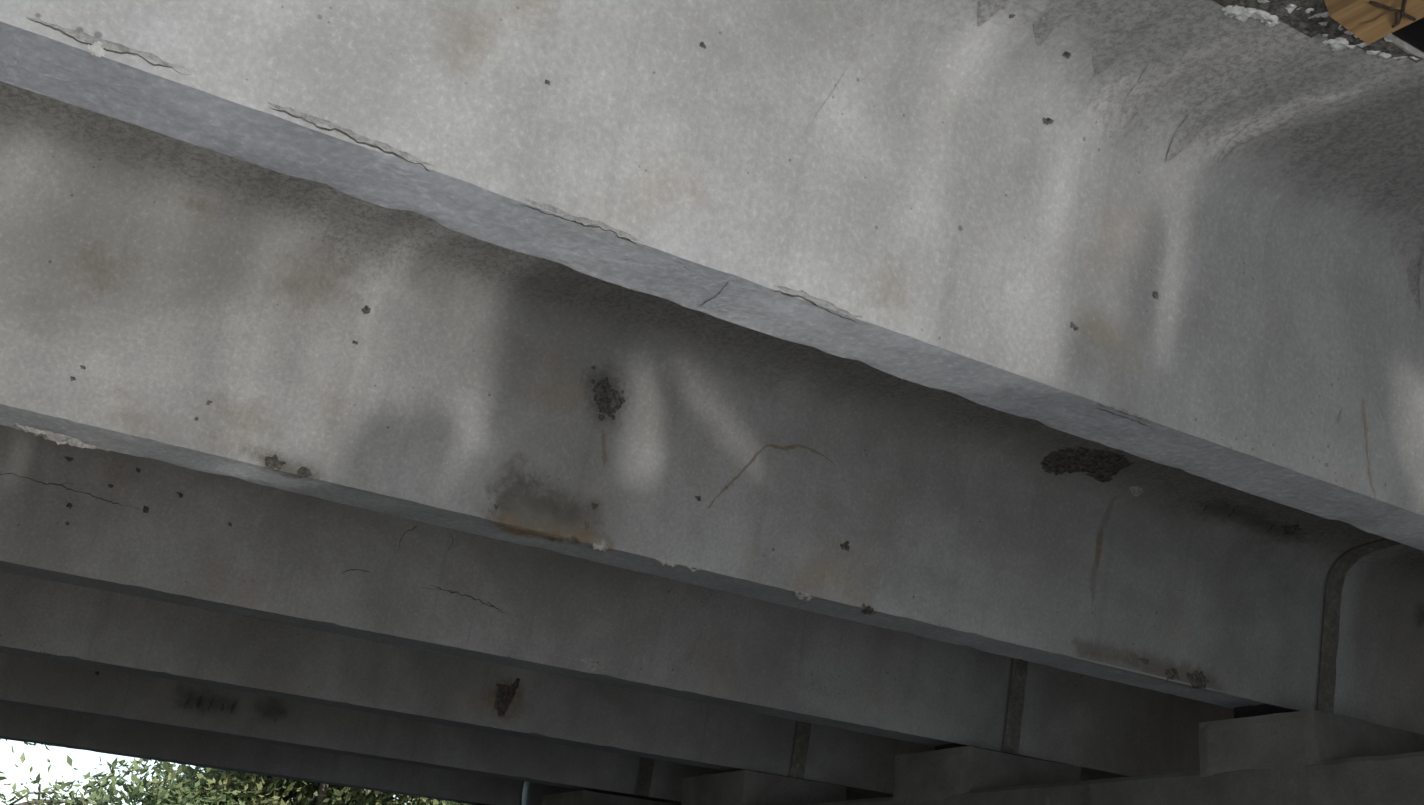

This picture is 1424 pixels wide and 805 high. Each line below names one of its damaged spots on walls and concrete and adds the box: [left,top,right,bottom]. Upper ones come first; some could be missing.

peeling [1212,0,1424,63]
spalling [590,365,626,421]
spalling [1040,447,1134,483]
spalling [494,678,520,717]